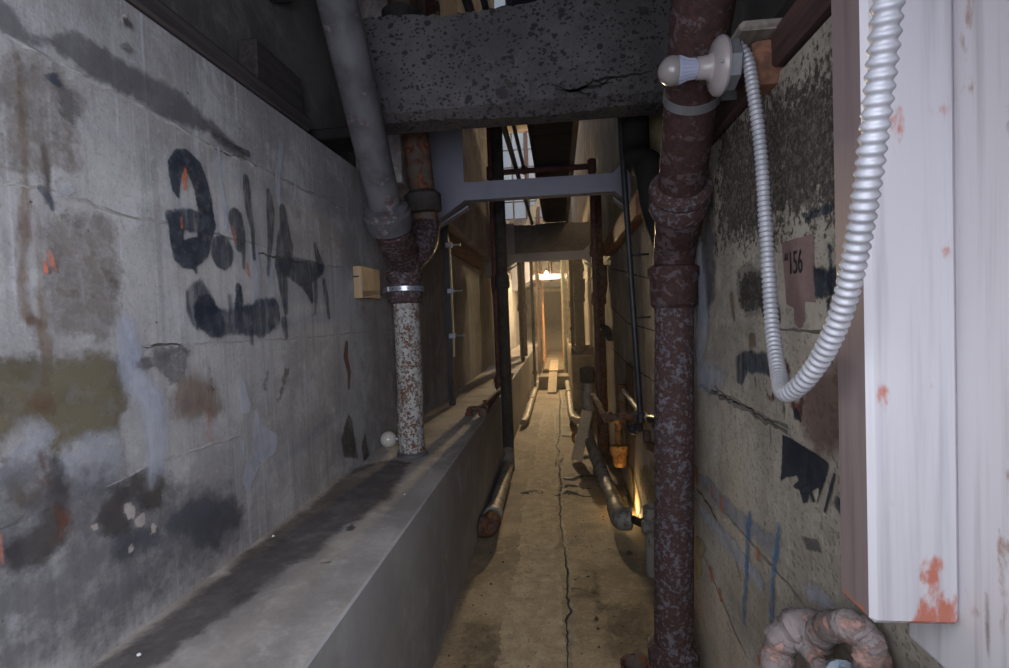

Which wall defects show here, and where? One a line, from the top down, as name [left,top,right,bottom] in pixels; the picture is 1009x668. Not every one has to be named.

water stain [0,3,39,43]
water stain [53,34,296,344]
crack [553,71,652,94]
water stain [0,322,241,668]
water stain [101,416,410,668]
crack [520,391,607,668]